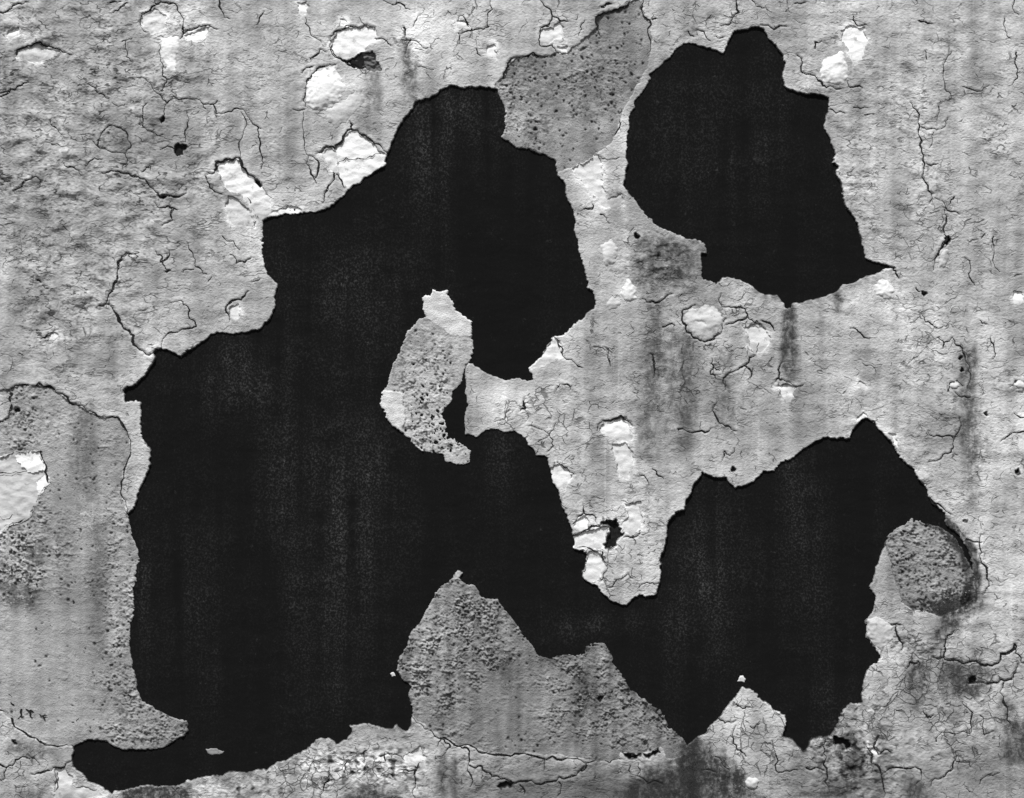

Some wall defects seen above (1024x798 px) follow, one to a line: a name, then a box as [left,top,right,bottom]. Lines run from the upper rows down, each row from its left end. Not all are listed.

crack [99,245,212,356]
crack [64,0,263,226]
crack [293,0,434,202]
spalling [72,85,975,793]
peeling [495,0,652,210]
crack [642,293,803,458]
spalling [624,26,894,308]
crack [892,51,996,462]
peeling [0,385,189,750]
crack [573,505,658,588]
peeling [54,767,106,798]
crack [866,623,1022,792]